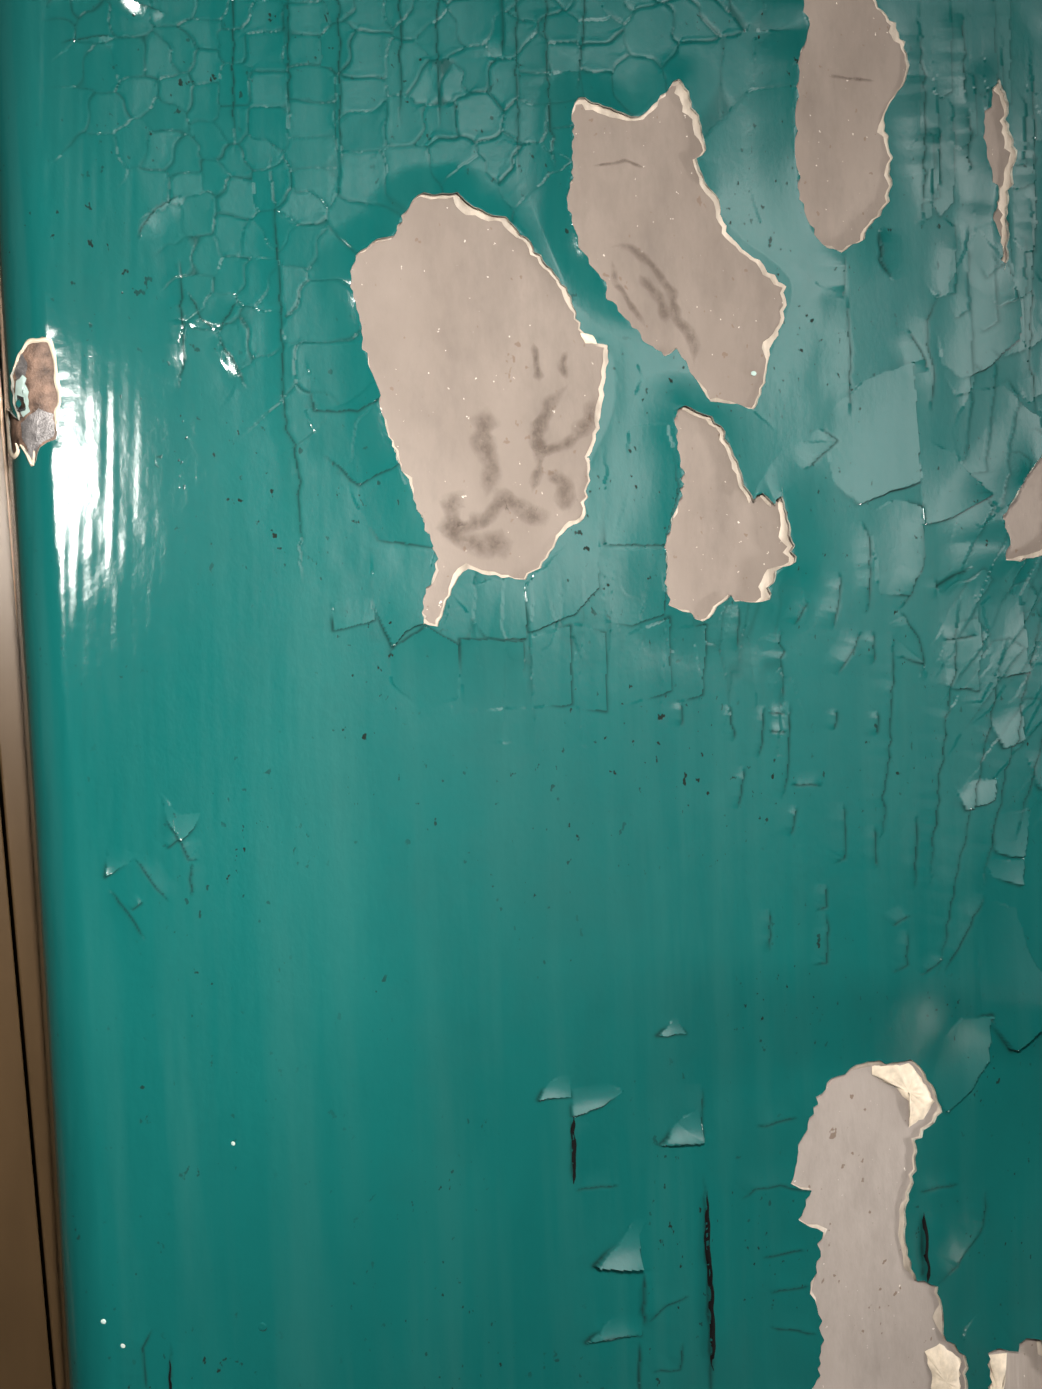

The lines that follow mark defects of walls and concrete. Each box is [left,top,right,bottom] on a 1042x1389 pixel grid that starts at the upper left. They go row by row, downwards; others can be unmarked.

peeling [6,337,61,466]
crack [39,0,785,594]
peeling [306,66,809,711]
peeling [779,0,924,265]
crack [796,0,1042,477]
peeling [825,65,1042,690]
crack [448,499,1042,991]
peeling [956,778,1030,885]
peeling [988,702,1042,786]
crack [563,1105,630,1199]
crack [579,1075,723,1389]
peeling [777,901,1042,1389]